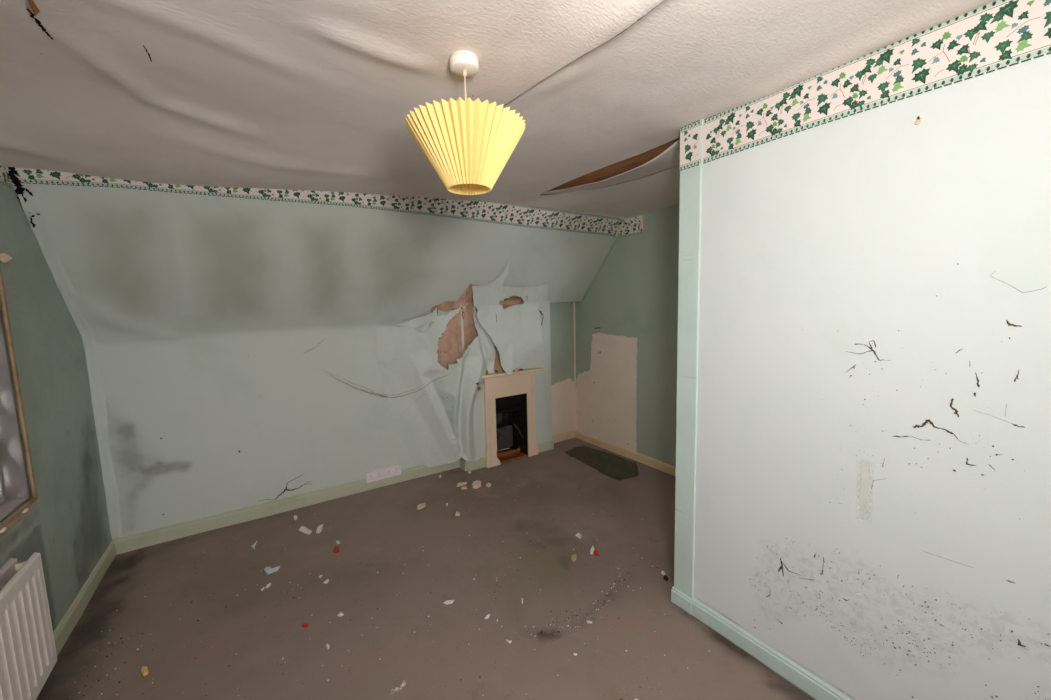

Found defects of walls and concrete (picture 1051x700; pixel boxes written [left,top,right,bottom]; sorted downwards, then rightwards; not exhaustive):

flaking render [499,295,524,310]
flaking render [430,283,479,370]
flaking render [493,342,504,372]
flaking render [551,333,638,452]
crack [259,475,308,501]
leakage [750,538,1028,673]
leakage [717,635,754,657]